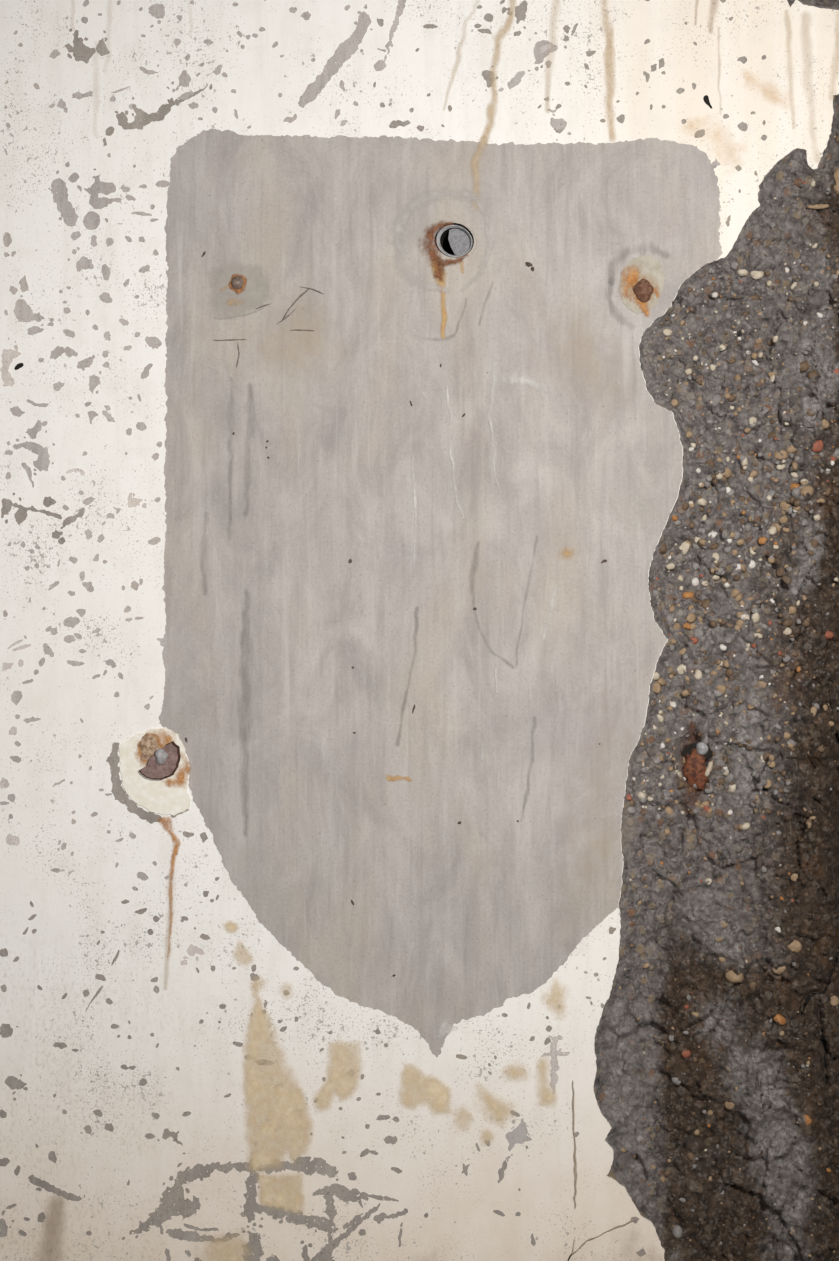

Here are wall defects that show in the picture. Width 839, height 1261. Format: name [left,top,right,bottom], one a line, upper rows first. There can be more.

leakage [472,1,514,195]
leakage [606,32,614,139]
peeling [636,58,666,95]
peeling [676,83,767,141]
corrosion [425,221,467,338]
corrosion [623,269,659,316]
corrosion [137,733,172,763]
corrosion [167,762,190,786]
corrosion [683,726,709,803]
corrosion [159,818,180,952]